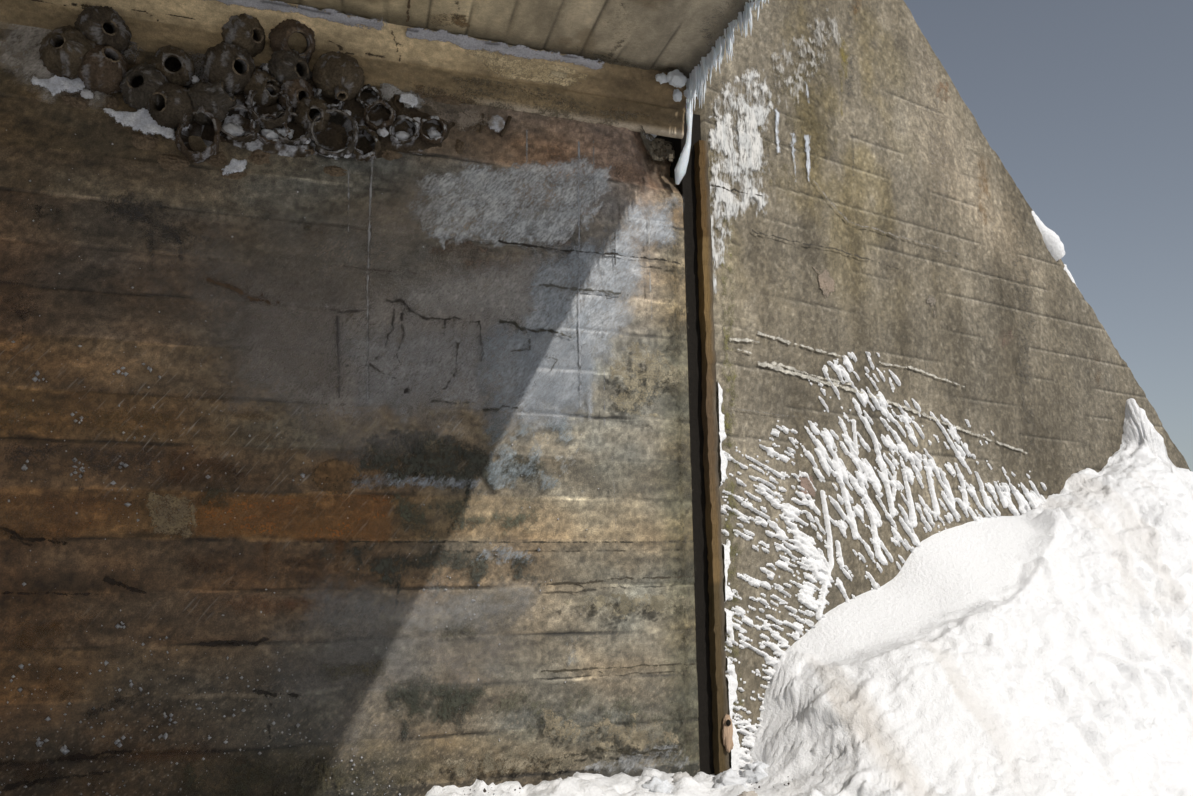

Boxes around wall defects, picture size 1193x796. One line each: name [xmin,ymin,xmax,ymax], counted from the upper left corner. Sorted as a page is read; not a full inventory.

crack [330,265,572,412]